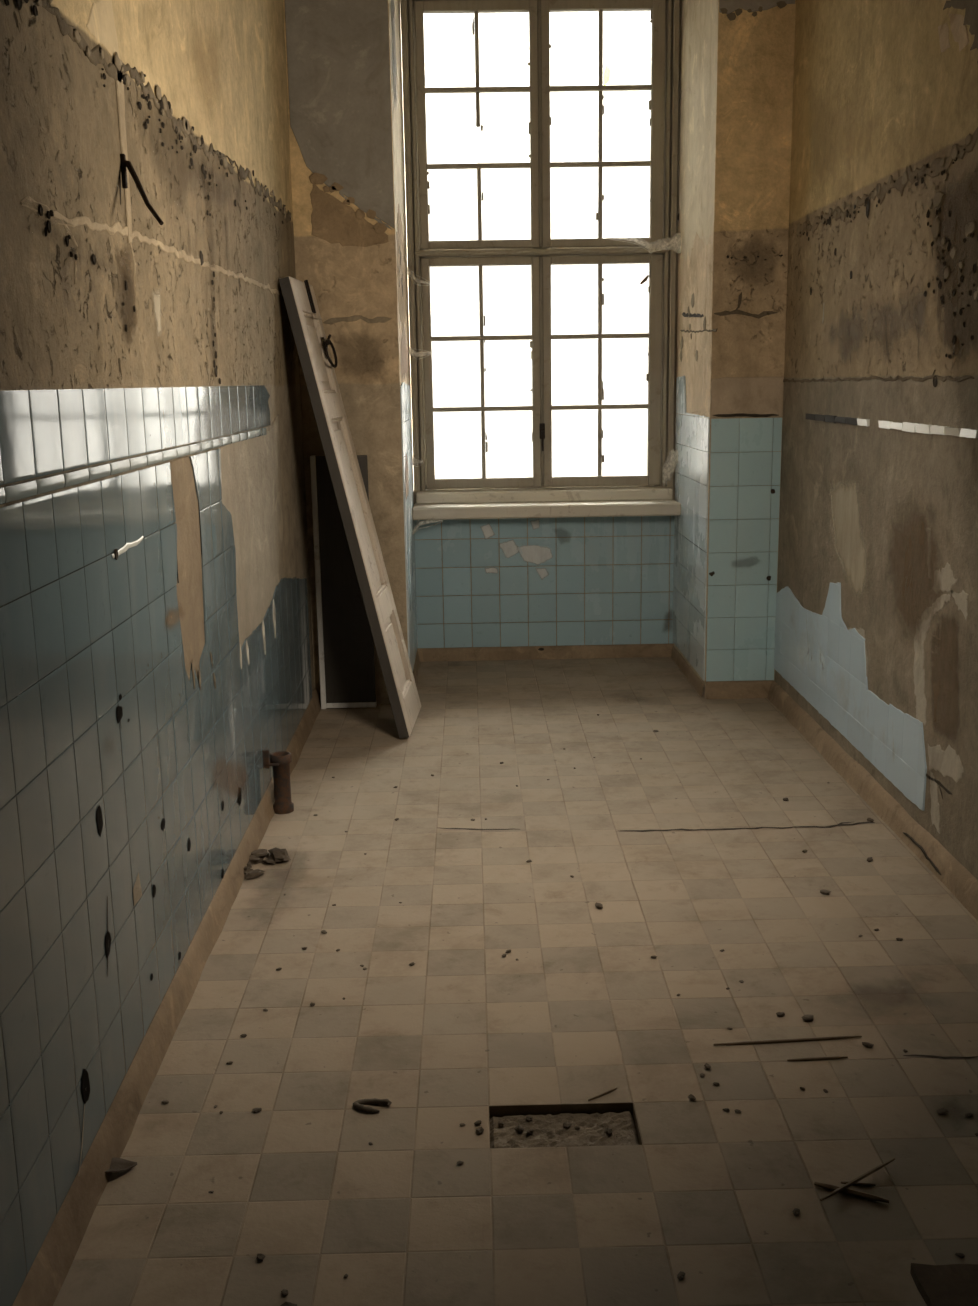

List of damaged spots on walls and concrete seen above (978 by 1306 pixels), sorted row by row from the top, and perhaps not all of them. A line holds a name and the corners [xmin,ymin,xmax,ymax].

spalling [4,0,291,224]
peeling [938,0,978,64]
spalling [796,127,978,359]
peeling [169,456,216,690]
peeling [217,415,283,669]
peeling [913,562,969,726]
peeling [928,744,964,834]
peeling [489,1111,639,1148]